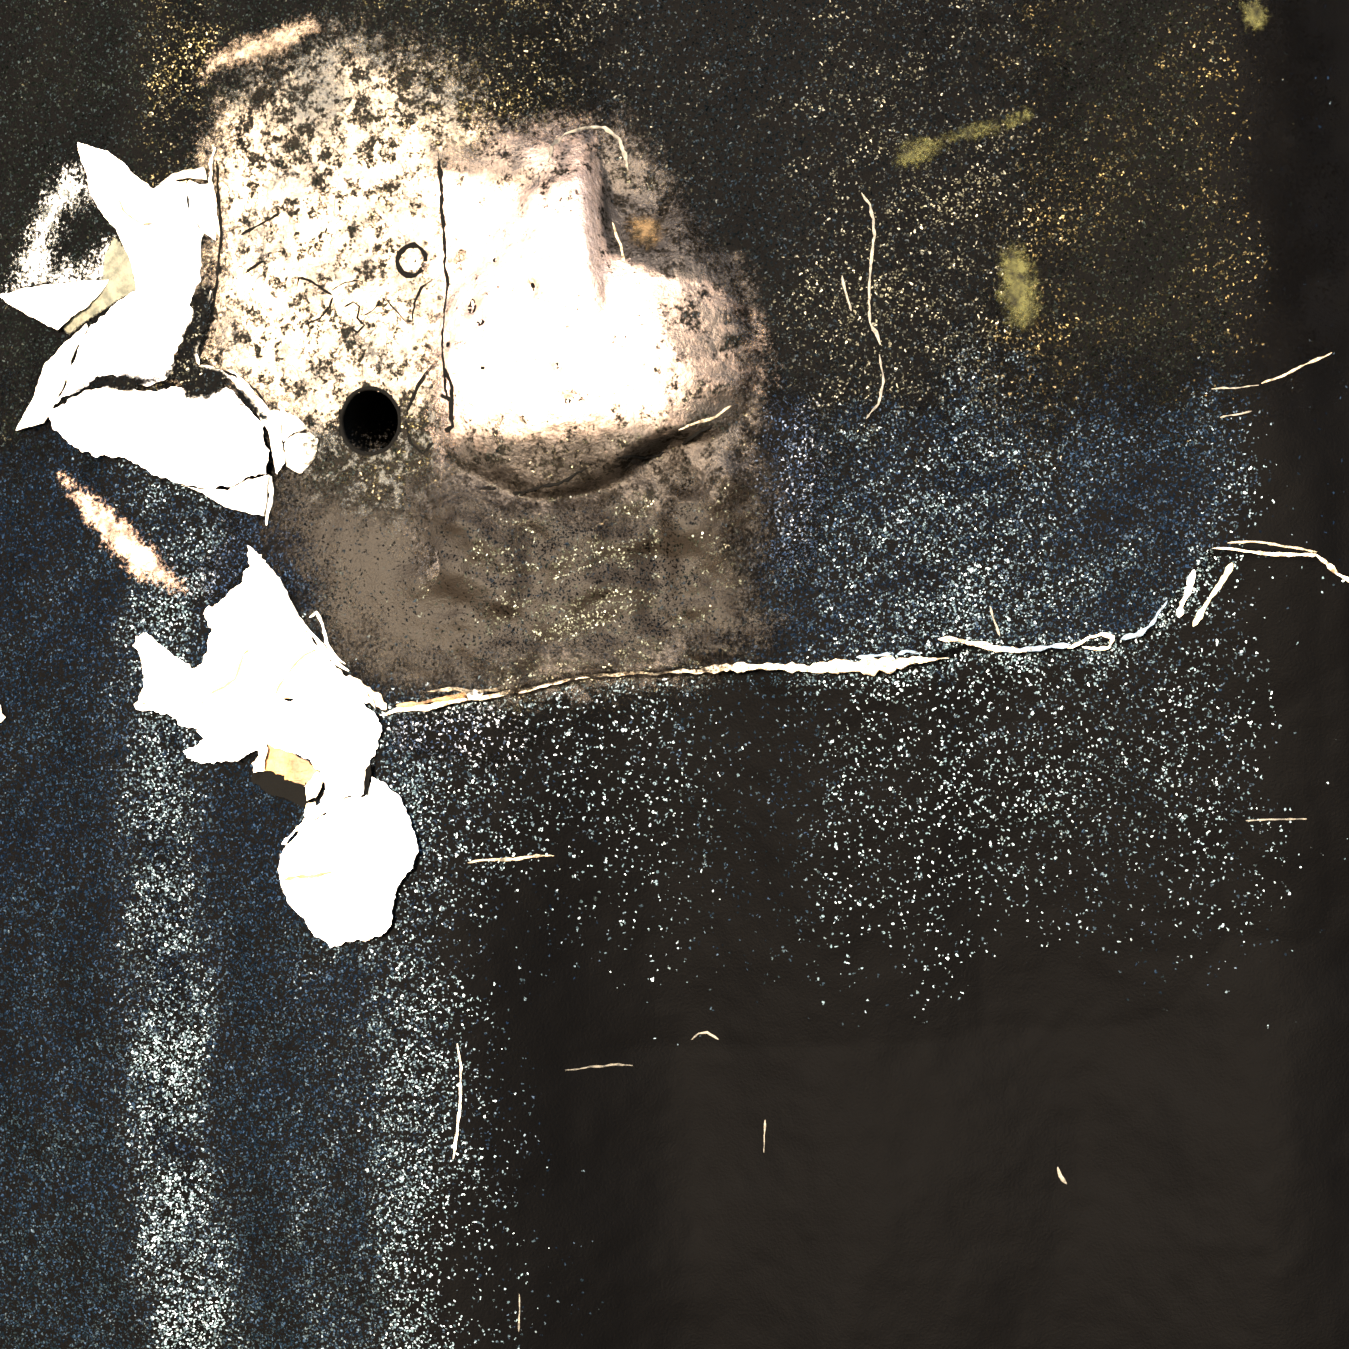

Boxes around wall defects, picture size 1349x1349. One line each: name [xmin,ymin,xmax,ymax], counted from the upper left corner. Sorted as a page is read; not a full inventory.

spalling [0,20,491,526]
crack [297,152,457,454]
leakage [202,499,329,603]
peeling [133,546,419,948]
crack [381,600,1168,715]
crack [1212,541,1349,583]